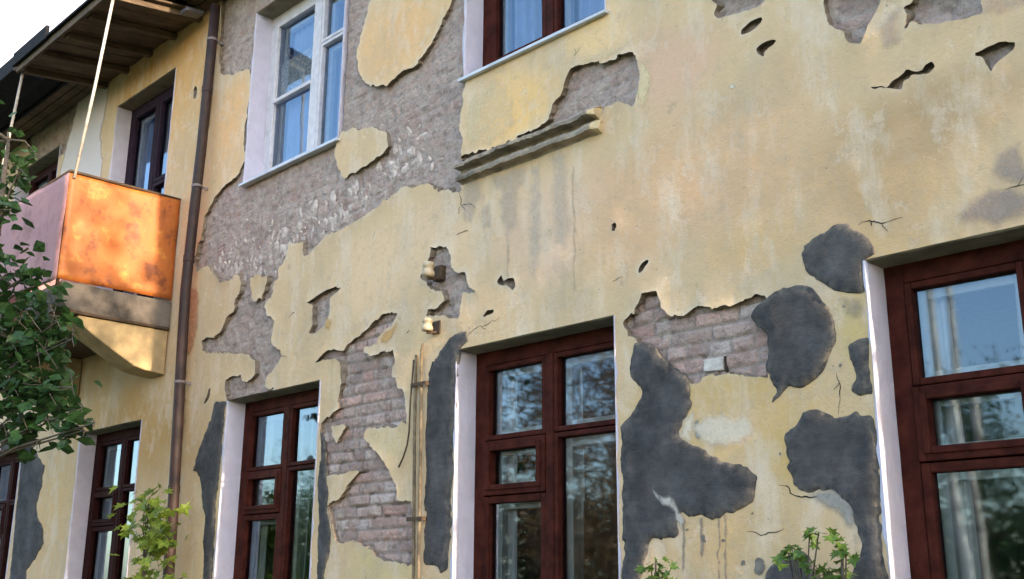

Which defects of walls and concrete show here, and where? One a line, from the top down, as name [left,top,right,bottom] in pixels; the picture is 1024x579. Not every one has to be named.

flaking render [823,0,881,44]
flaking render [506,52,640,143]
flaking render [871,62,935,90]
flaking render [194,0,494,401]
flaking render [623,291,769,384]
flaking render [316,312,416,566]